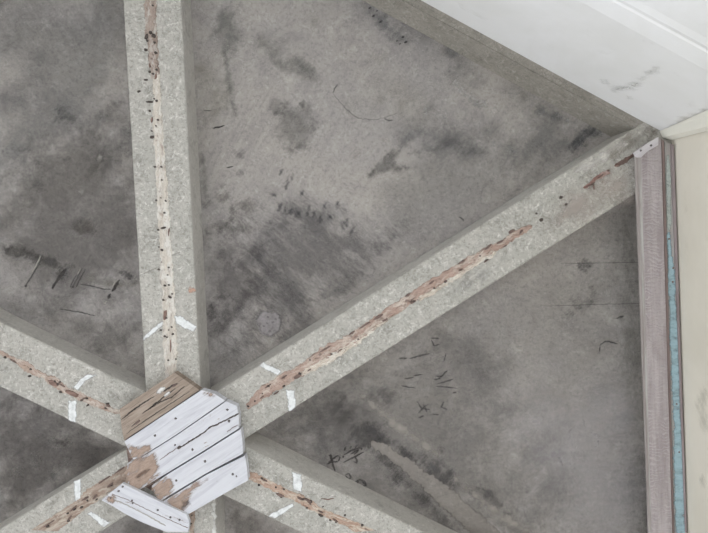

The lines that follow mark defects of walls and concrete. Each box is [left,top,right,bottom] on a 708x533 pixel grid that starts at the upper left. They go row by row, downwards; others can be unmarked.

spalling [143,0,179,378]
spalling [246,212,543,409]